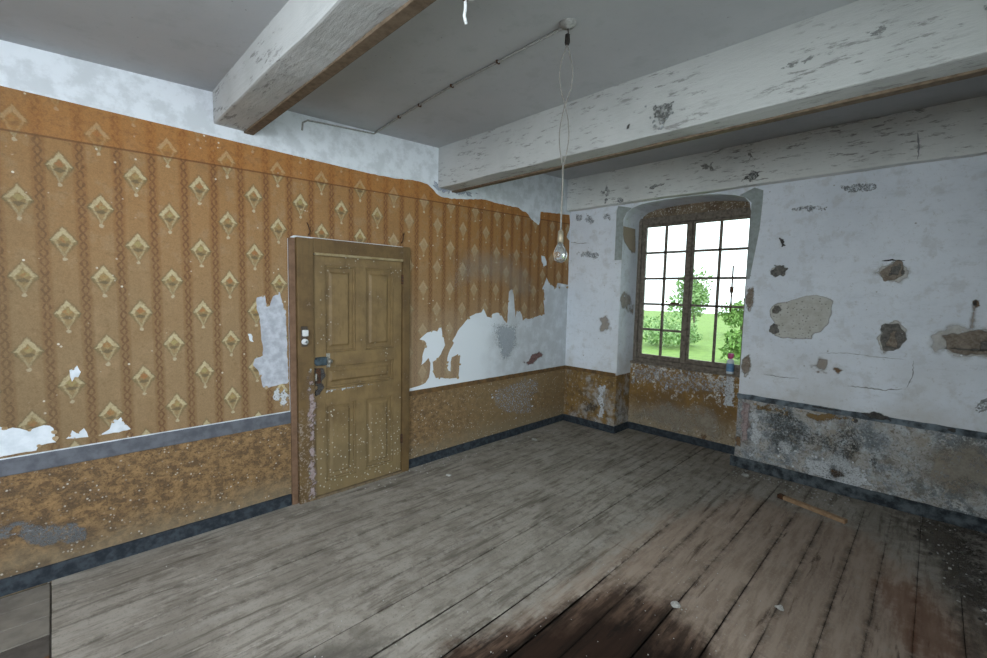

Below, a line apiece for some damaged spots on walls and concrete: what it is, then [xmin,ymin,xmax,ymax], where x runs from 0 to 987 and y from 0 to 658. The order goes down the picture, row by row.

flaking render [878,260,908,282]
flaking render [769,295,833,339]
flaking render [877,321,907,352]
flaking render [931,325,987,356]
damp [585,385,606,418]
damp [749,410,861,461]